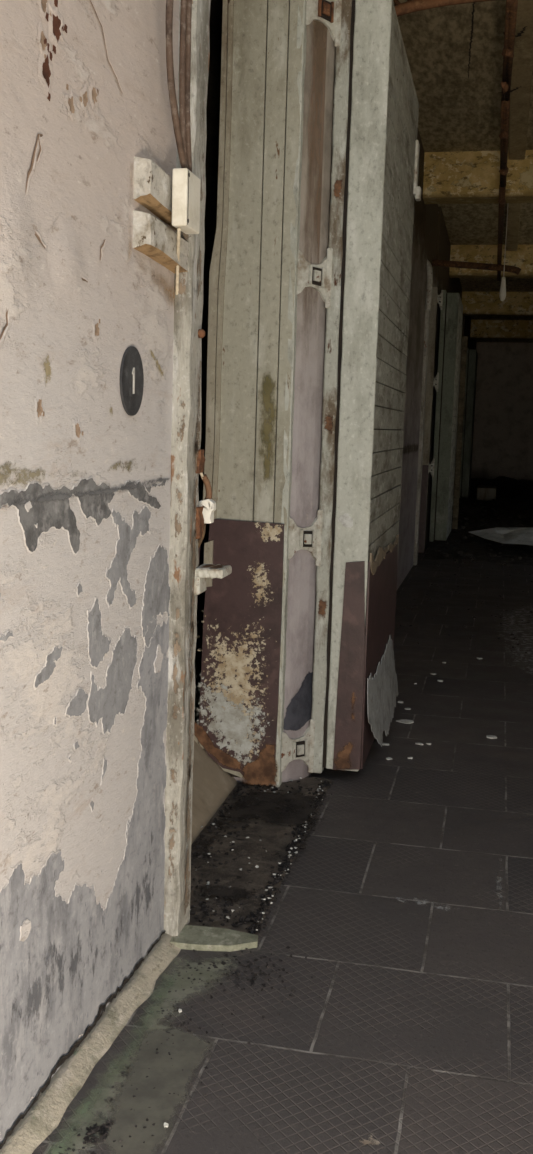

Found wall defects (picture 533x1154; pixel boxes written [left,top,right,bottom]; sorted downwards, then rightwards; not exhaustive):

spalling [36,0,99,122]
crack [90,0,123,94]
peeling [0,361,313,1144]
rust [194,723,278,786]